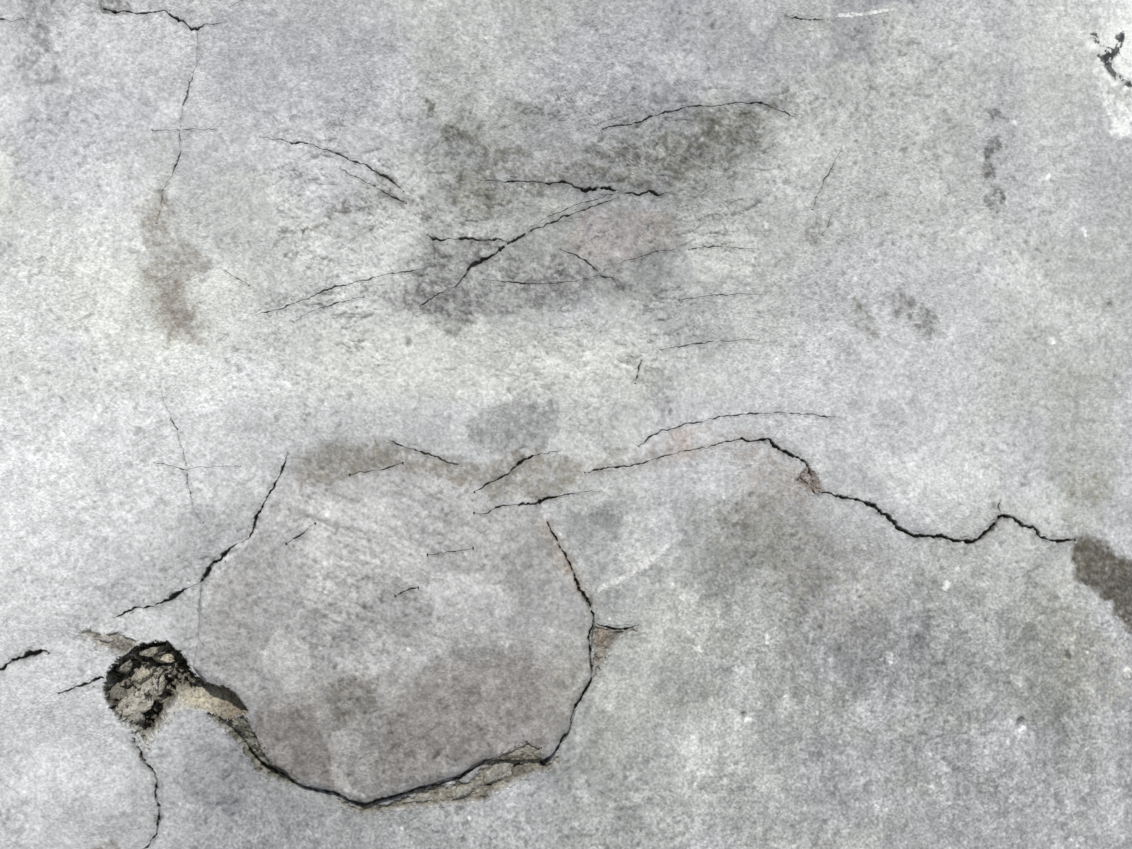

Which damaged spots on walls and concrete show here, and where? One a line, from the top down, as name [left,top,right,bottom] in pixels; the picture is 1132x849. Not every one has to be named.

crack [0,16,28,24]
crack [103,0,247,224]
crack [260,135,406,205]
crack [603,100,797,131]
crack [256,178,765,324]
crack [155,387,240,524]
crack [0,647,49,674]
crack [58,674,107,696]
crack [113,453,290,620]
crack [245,410,1074,809]
leakage [1013,383,1132,721]
crack [130,732,164,849]